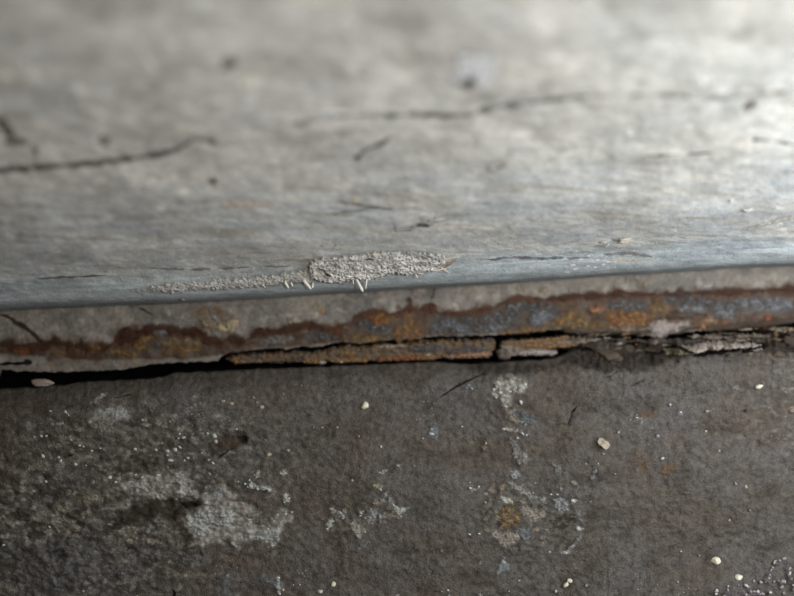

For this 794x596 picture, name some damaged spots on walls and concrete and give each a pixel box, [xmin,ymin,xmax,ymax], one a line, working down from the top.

crack [0,140,190,173]
crack [2,314,42,342]
corrosion [0,285,794,359]
peeling [688,326,788,340]
crack [0,358,32,366]
crack [646,342,793,357]
crack [436,373,484,401]
leakage [0,393,293,592]